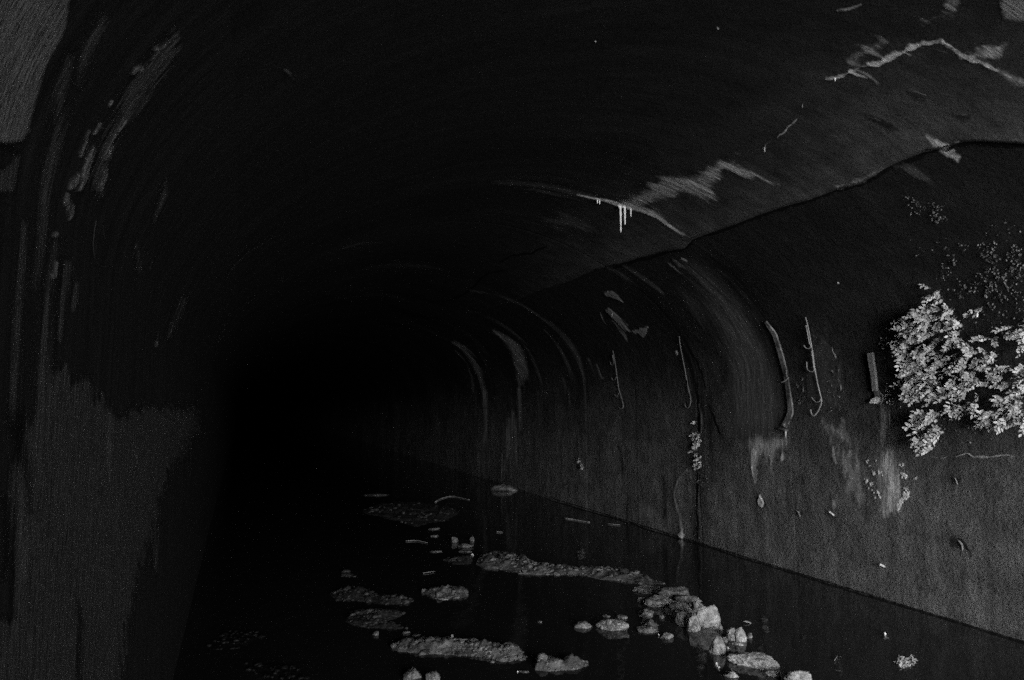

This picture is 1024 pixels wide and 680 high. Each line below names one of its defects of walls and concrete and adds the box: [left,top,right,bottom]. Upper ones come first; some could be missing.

damp [830,40,949,81]
damp [968,47,1024,86]
damp [513,163,769,234]
crack [611,142,1024,269]
damp [670,258,787,475]
damp [833,448,916,511]